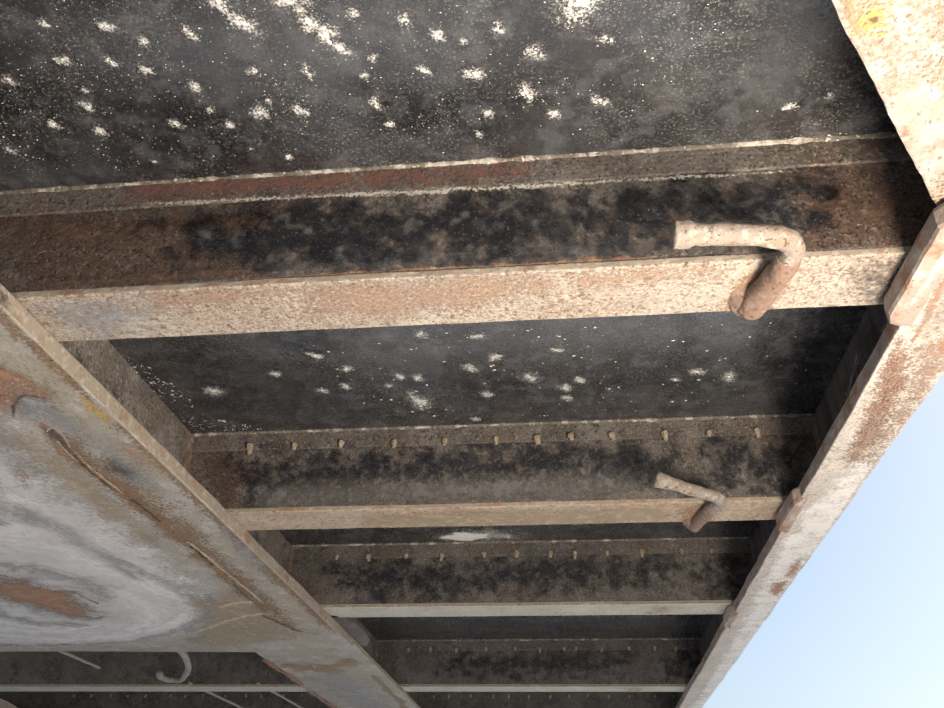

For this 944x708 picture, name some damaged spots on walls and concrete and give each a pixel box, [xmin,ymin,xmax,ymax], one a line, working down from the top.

rust [842,0,895,38]
water stain [141,170,790,205]
rust [0,161,765,633]
water stain [0,416,307,649]
rust [770,558,802,595]